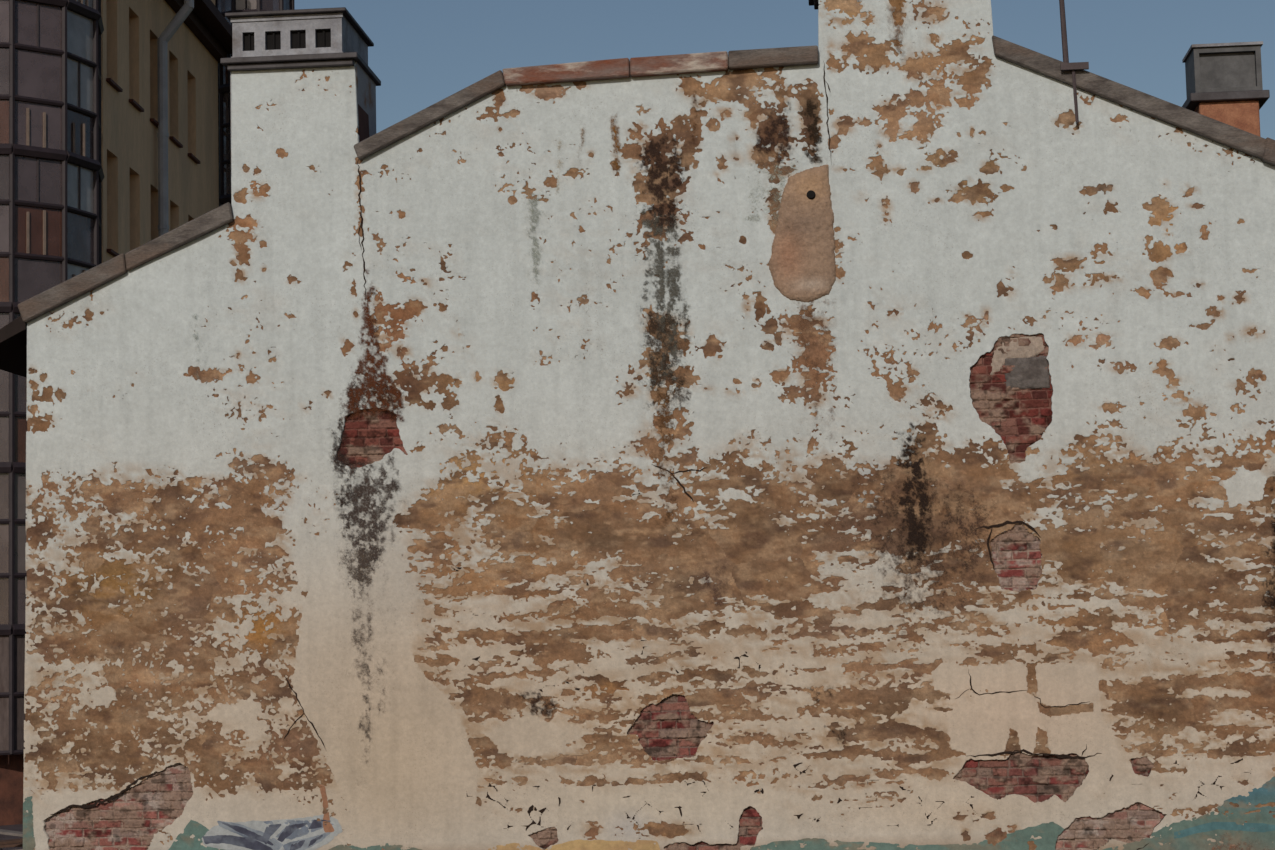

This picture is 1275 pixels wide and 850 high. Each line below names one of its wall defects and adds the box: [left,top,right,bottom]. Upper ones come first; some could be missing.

peeling [465,89,594,205]
peeling [1054,93,1095,135]
peeling [1110,105,1133,128]
peeling [1158,127,1255,165]
peeling [46,289,104,332]
peeling [183,164,296,430]
water stain [639,137,691,497]
peeling [27,368,66,434]
peeling [336,149,1275,850]
water stain [1263,521,1275,609]
peeling [24,448,347,850]